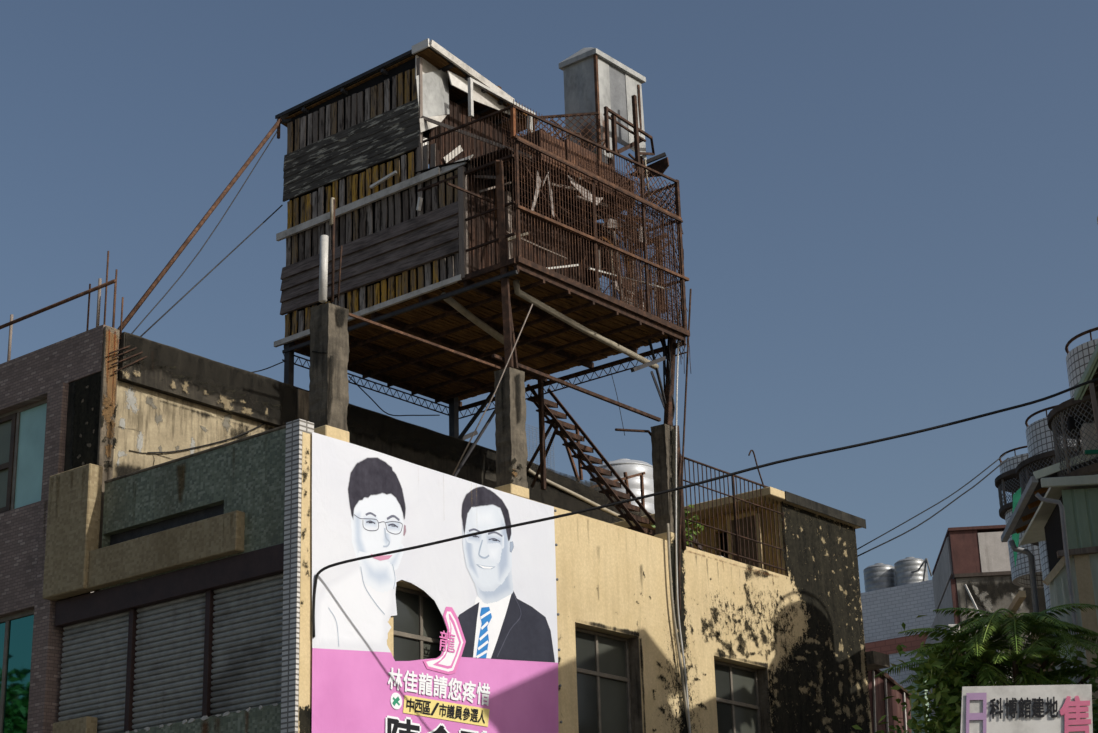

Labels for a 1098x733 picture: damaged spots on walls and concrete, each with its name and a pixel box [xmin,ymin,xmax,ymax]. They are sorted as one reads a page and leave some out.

water stain [72,372,101,469]
corrosion [106,330,118,415]
water stain [116,465,142,477]
water stain [109,333,309,440]
flaking render [204,390,252,415]
water stain [347,404,496,473]
mould [765,503,871,733]